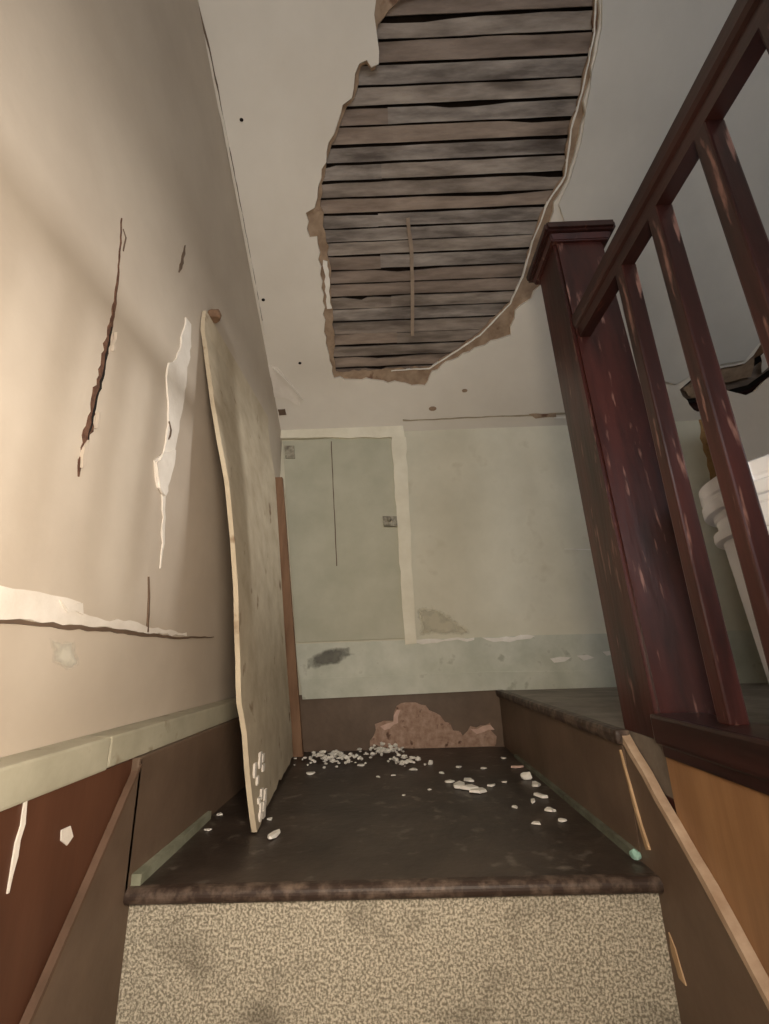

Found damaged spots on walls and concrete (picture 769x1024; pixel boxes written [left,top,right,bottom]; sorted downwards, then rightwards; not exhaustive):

flaking render [306,0,598,385]
crack [77,218,127,477]
flaking render [721,345,769,395]
peeling [153,317,191,569]
peeling [0,585,187,636]
leakage [314,649,348,665]
peeling [370,702,497,765]